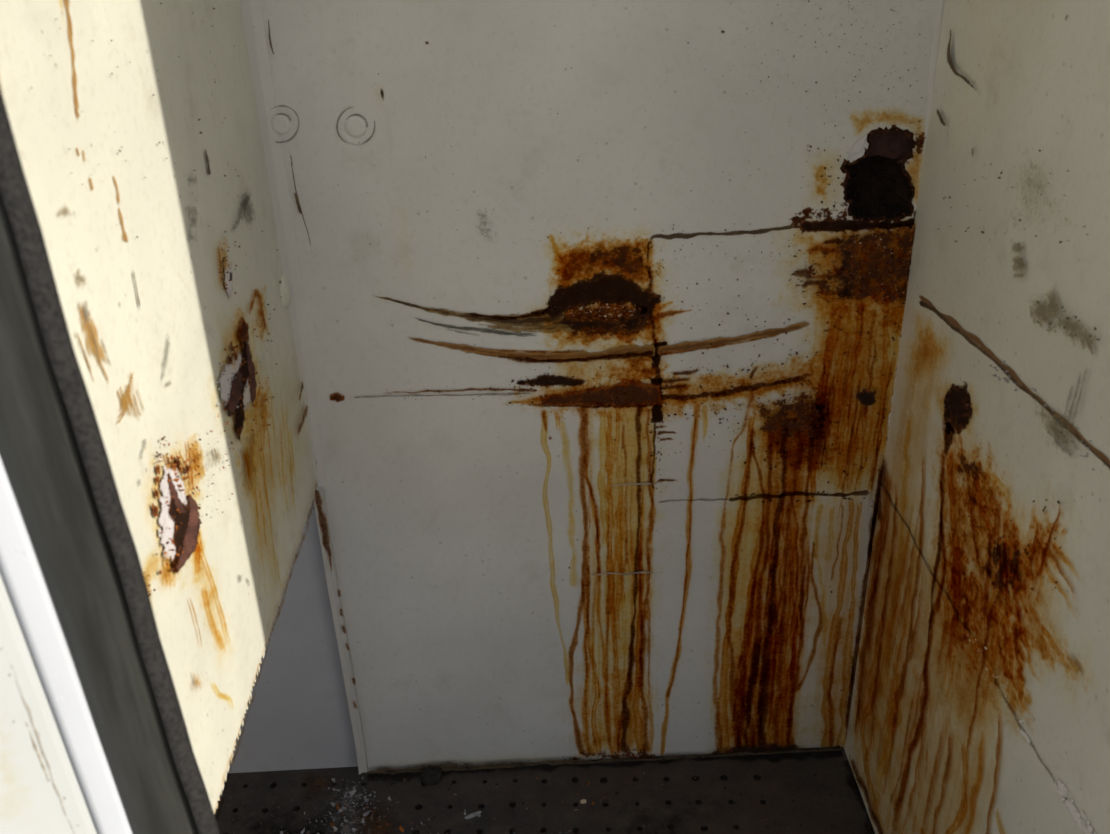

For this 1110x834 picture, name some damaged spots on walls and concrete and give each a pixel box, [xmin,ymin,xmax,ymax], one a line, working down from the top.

spalling [844,145,913,221]
rust [143,290,278,596]
rust [473,120,1073,834]